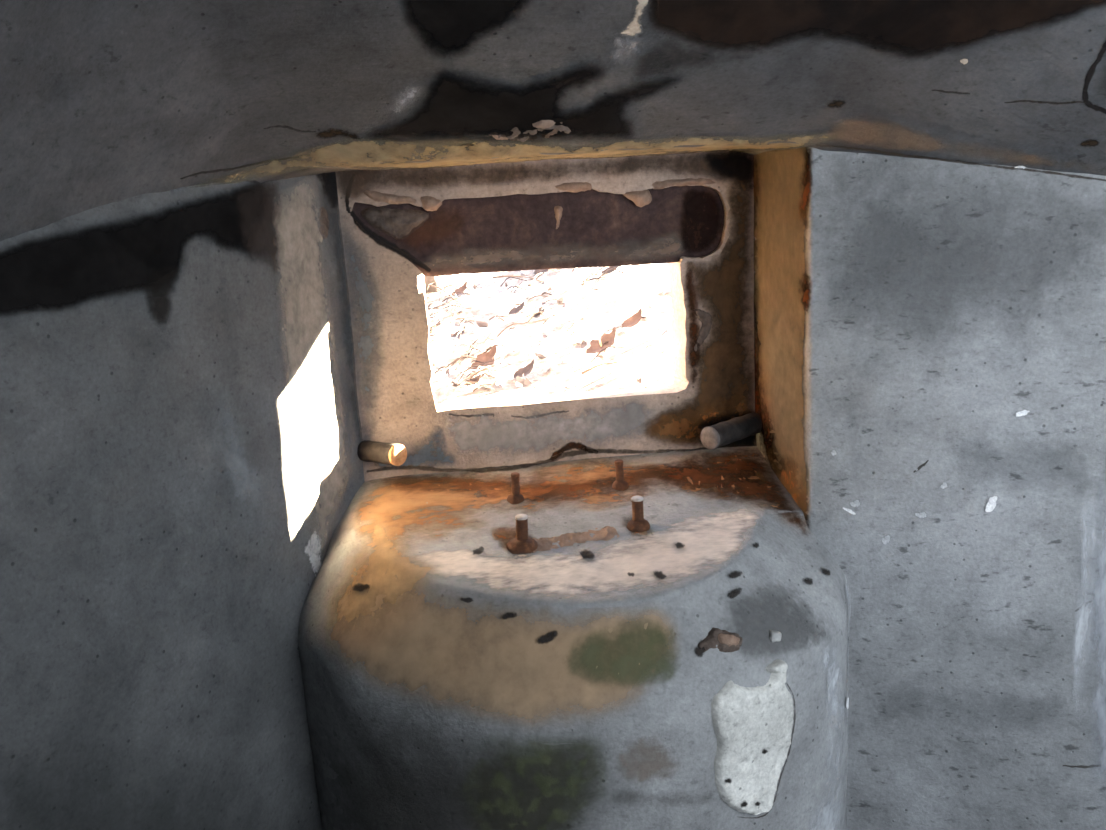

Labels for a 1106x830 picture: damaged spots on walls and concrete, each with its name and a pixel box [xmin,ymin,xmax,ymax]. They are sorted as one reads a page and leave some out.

crack [932,88,970,96]
crack [1004,42,1106,114]
spalling [492,120,571,142]
spalling [352,178,724,276]
corrosion [356,162,806,548]